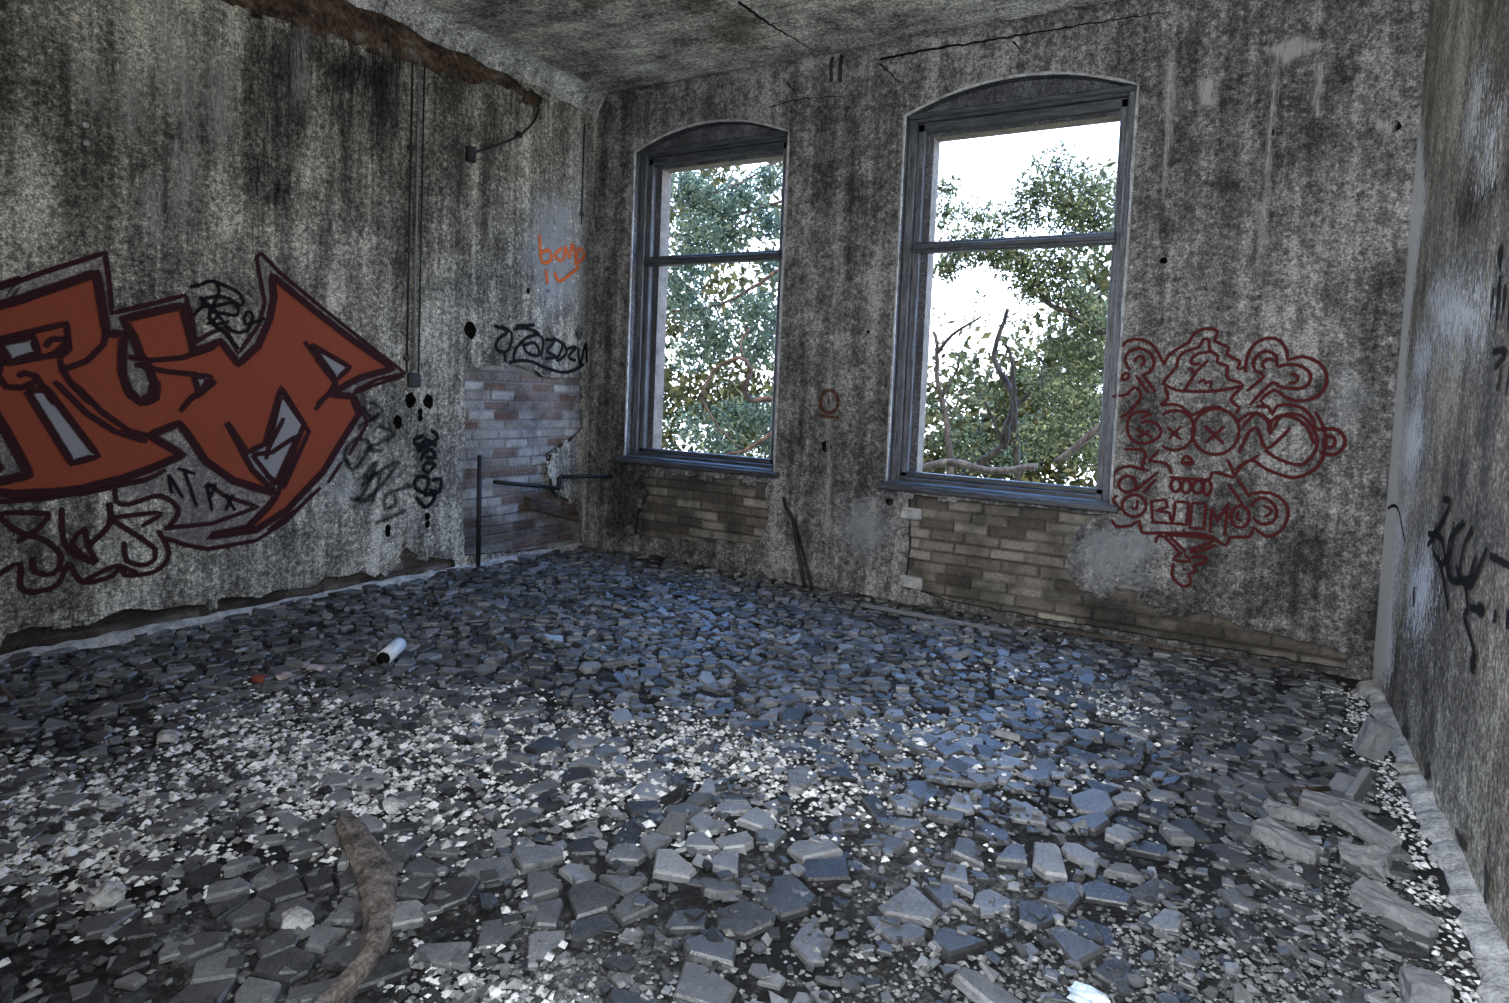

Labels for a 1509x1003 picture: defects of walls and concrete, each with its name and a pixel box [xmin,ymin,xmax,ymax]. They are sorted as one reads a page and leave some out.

leakage [249,29,398,206]
spalling [222,0,539,107]
leakage [1200,79,1215,105]
leakage [1267,36,1323,115]
spalling [0,362,586,655]